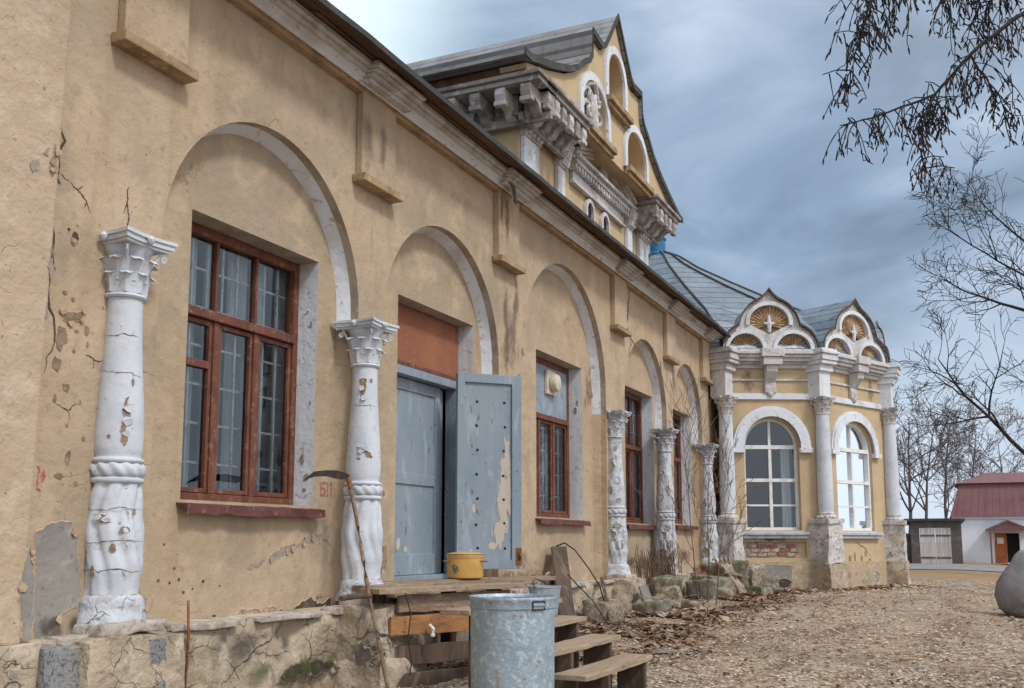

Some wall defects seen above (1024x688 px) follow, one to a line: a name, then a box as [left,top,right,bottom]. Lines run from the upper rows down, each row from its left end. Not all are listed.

spalling [30,142,63,177]
crack [57,130,90,211]
crack [44,229,56,373]
peeling [46,290,90,372]
peeling [107,378,134,446]
peeling [359,378,381,402]
peeling [356,445,373,460]
spalling [16,520,94,642]
peeling [93,513,130,533]
crack [84,507,143,576]
flaking render [744,542,800,558]
crack [185,621,401,688]